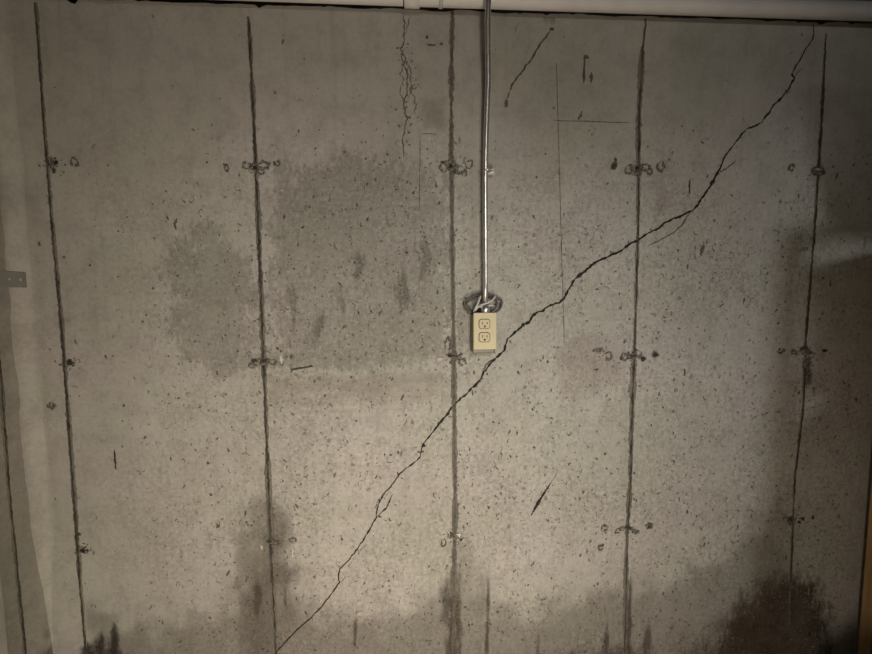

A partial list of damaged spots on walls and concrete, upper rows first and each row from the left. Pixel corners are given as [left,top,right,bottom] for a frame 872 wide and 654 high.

crack [275,13,814,653]
leakage [83,625,118,654]
leakage [445,589,461,654]
leakage [711,577,826,654]